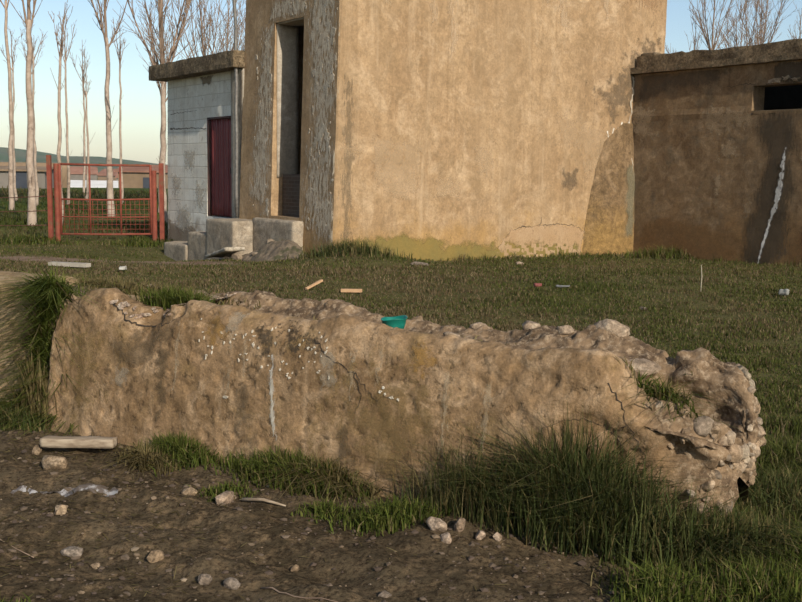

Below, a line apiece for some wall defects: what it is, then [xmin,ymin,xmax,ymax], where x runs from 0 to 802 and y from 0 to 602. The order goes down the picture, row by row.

peeling [249,0,340,242]
damp [594,38,725,149]
damp [700,104,796,264]
crack [315,340,398,411]
crack [540,383,646,463]